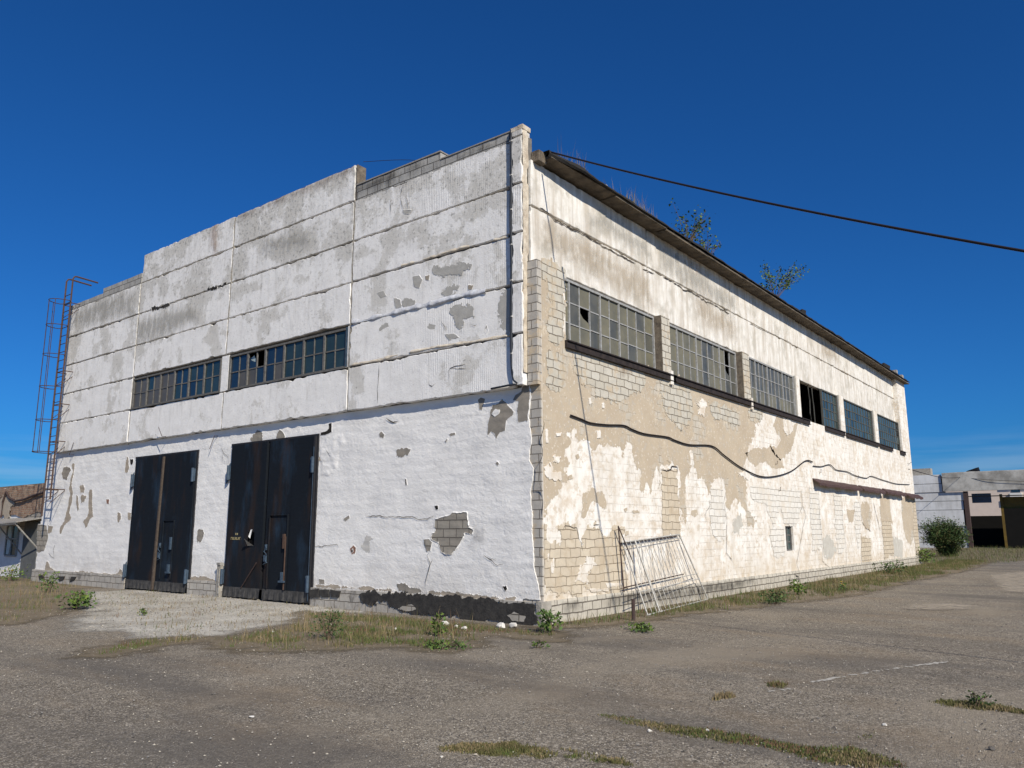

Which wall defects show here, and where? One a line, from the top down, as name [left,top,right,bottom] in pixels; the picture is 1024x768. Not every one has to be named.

peeling [377,261,475,341]
peeling [477,257,920,597]
flaking render [36,463,123,582]
flaking render [423,505,474,556]